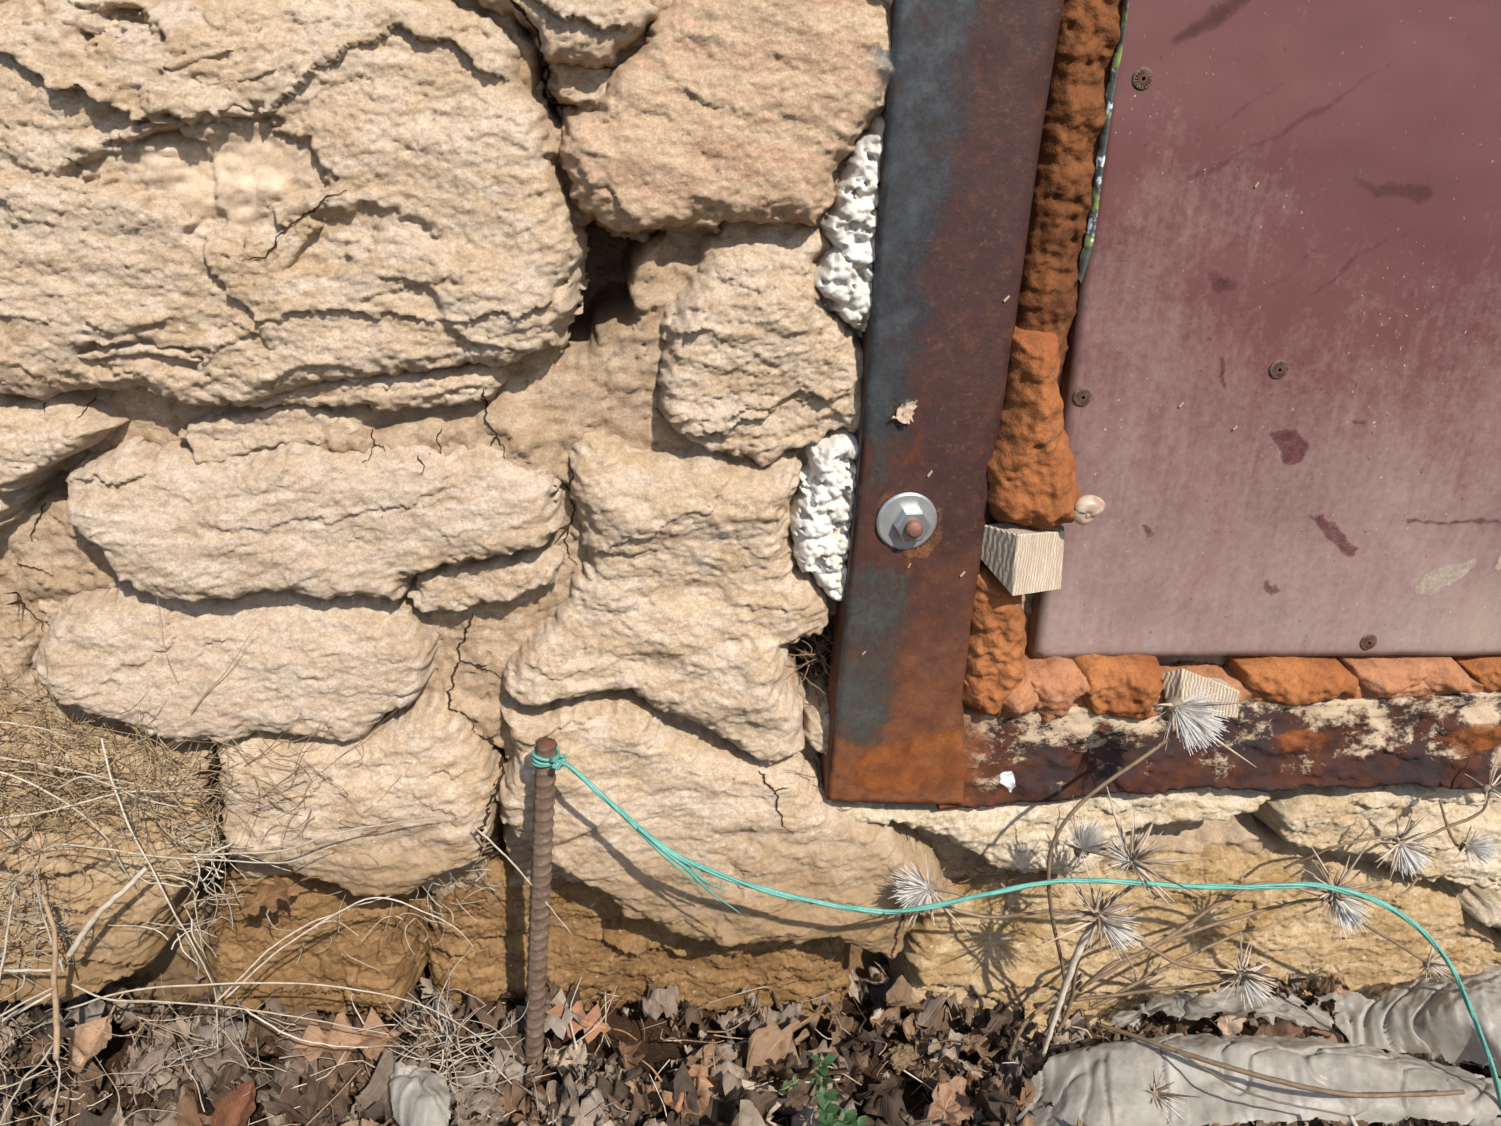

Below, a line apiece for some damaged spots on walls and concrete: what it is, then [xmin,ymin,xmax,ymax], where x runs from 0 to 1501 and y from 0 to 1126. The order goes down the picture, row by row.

crack [509,0,565,116]
crack [446,613,510,861]
rust [1277,730,1329,752]
rust [1439,724,1501,754]